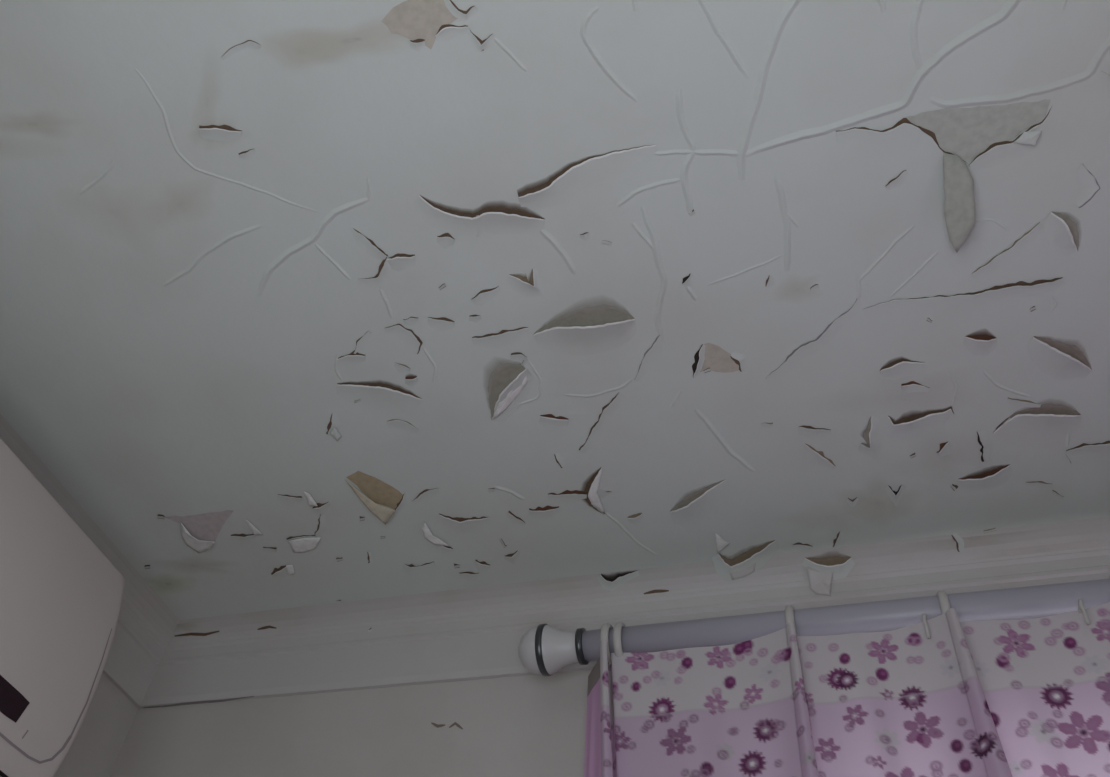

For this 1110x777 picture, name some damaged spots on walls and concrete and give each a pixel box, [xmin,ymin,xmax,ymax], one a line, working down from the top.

peeling [381,0,495,52]
crack [554,0,1065,468]
peeling [836,99,1061,252]
peeling [972,164,1100,279]
peeling [337,362,421,434]
peeling [336,228,454,366]
peeling [469,268,637,423]
peeling [692,343,747,378]
peeling [345,471,439,539]
peeling [712,532,856,596]